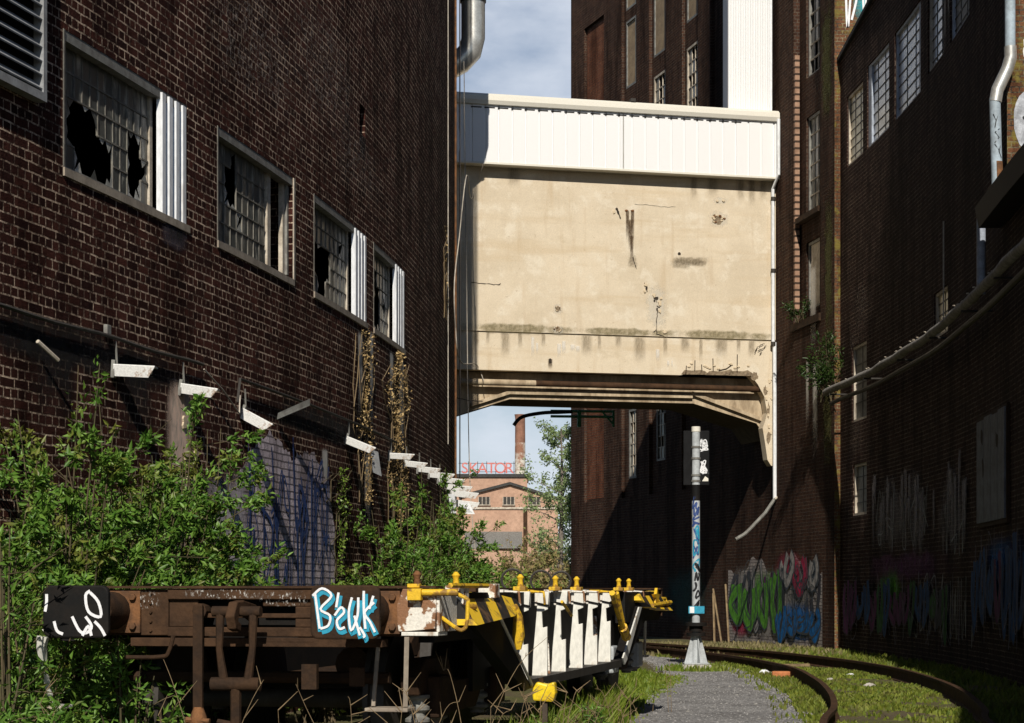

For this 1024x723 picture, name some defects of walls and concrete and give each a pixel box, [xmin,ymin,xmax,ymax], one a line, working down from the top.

rust [625,209,634,252]
crack [633,257,667,337]
water stain [485,324,554,349]
water stain [690,331,759,339]
spalling [682,354,773,444]